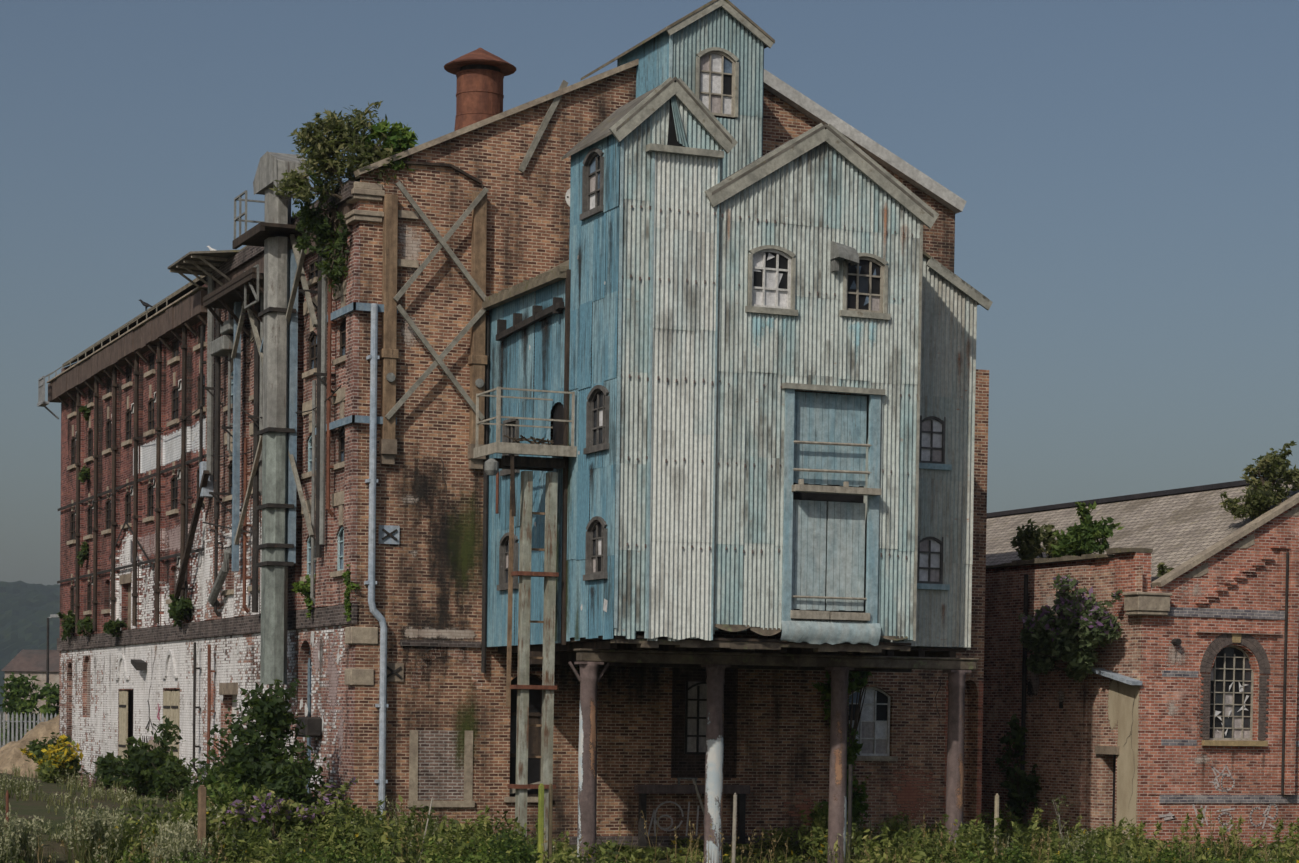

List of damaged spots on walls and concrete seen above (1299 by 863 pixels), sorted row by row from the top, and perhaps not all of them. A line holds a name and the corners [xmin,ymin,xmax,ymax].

damp [399,227,421,270]
damp [402,325,417,345]
peeling [60,503,345,803]
peeling [705,713,724,863]